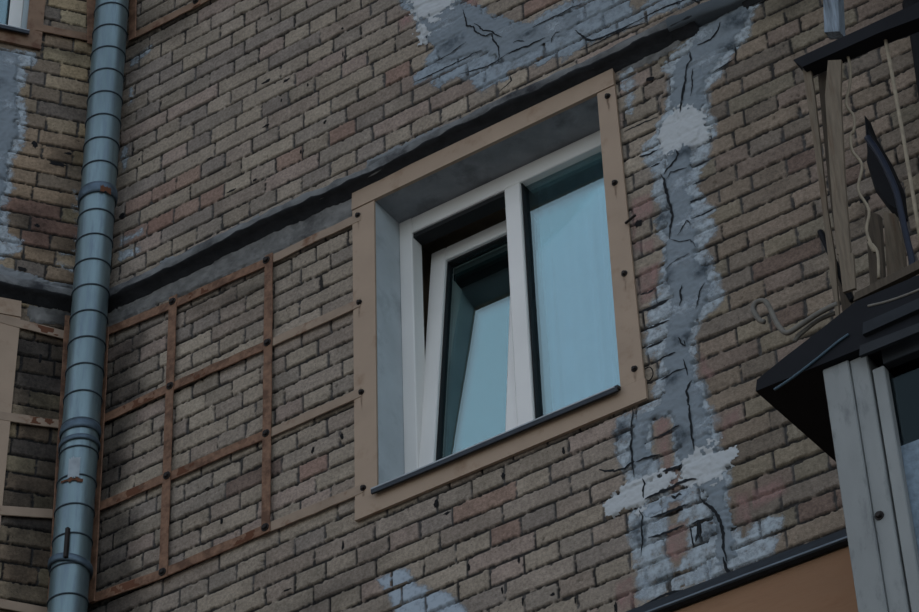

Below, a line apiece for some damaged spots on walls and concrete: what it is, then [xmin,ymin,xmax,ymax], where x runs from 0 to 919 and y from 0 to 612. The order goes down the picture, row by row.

crack [413,0,702,90]
crack [679,12,737,111]
crack [639,150,716,268]
crack [599,282,731,573]